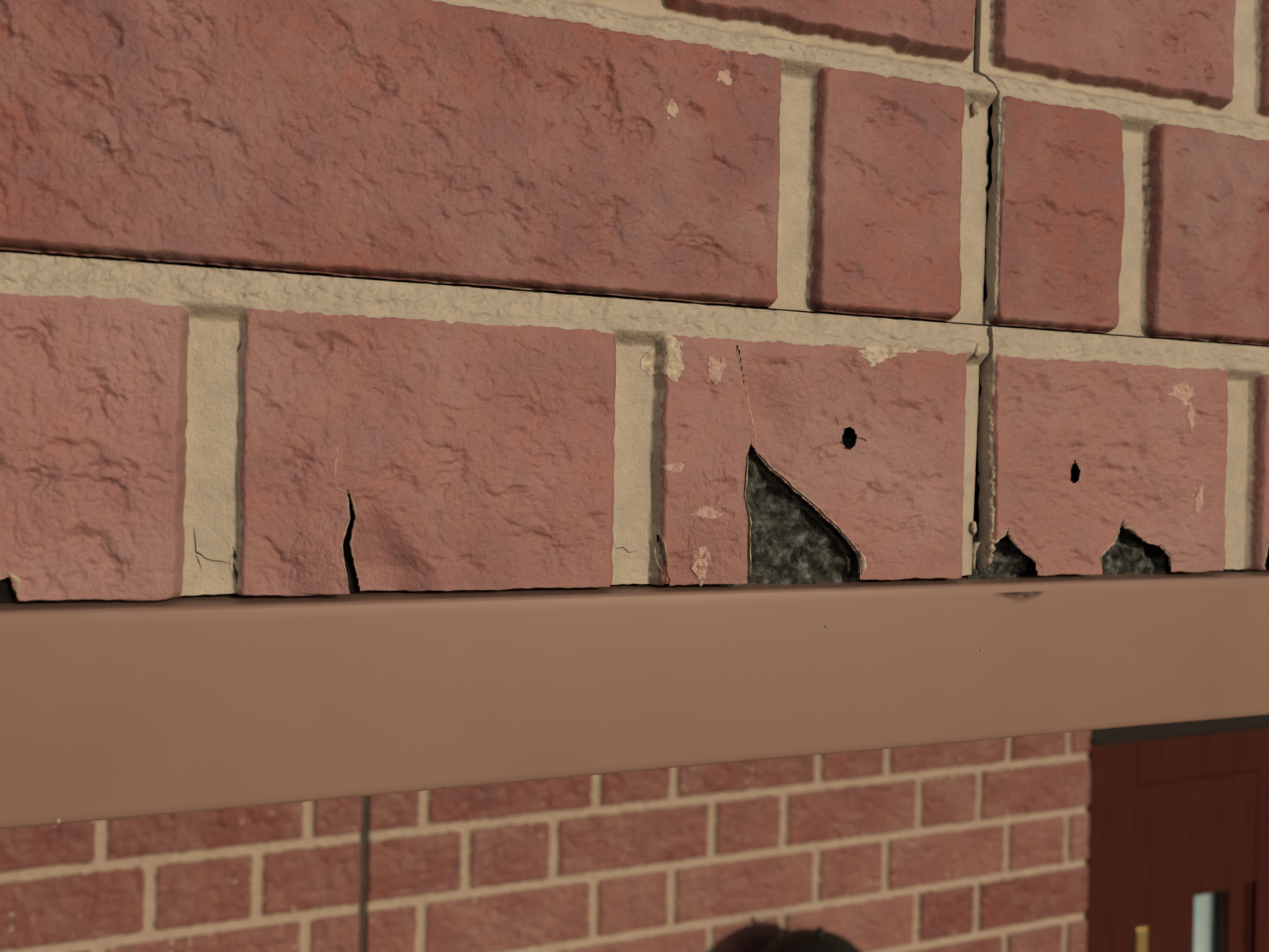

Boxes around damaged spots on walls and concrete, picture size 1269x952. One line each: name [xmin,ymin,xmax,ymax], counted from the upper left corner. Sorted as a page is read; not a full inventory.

peeling [641,331,684,382]
peeling [707,356,726,385]
spalling [836,409,859,450]
crack [970,402,996,570]
crack [334,441,376,593]
peeling [691,506,724,519]
spalling [720,441,866,586]
peeling [691,545,711,586]
spalling [968,527,1043,579]
spalling [1076,519,1174,576]